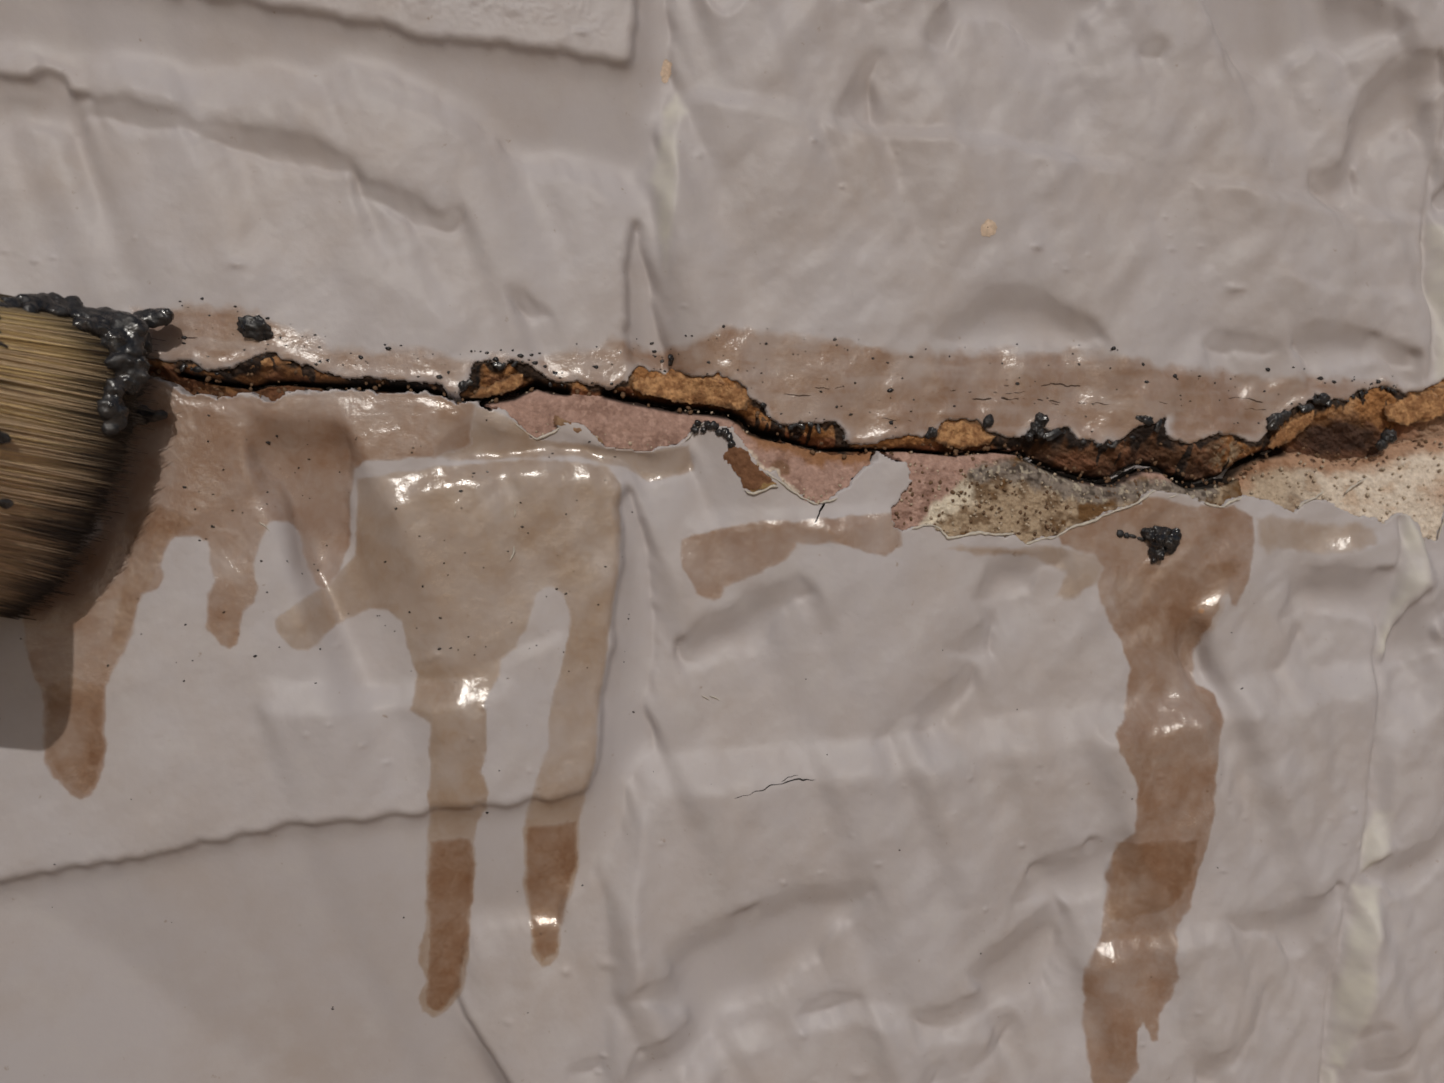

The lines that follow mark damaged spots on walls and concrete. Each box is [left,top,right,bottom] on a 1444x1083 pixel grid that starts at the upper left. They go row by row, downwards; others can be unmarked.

crack [147,352,1444,488]
peeling [483,390,1444,545]